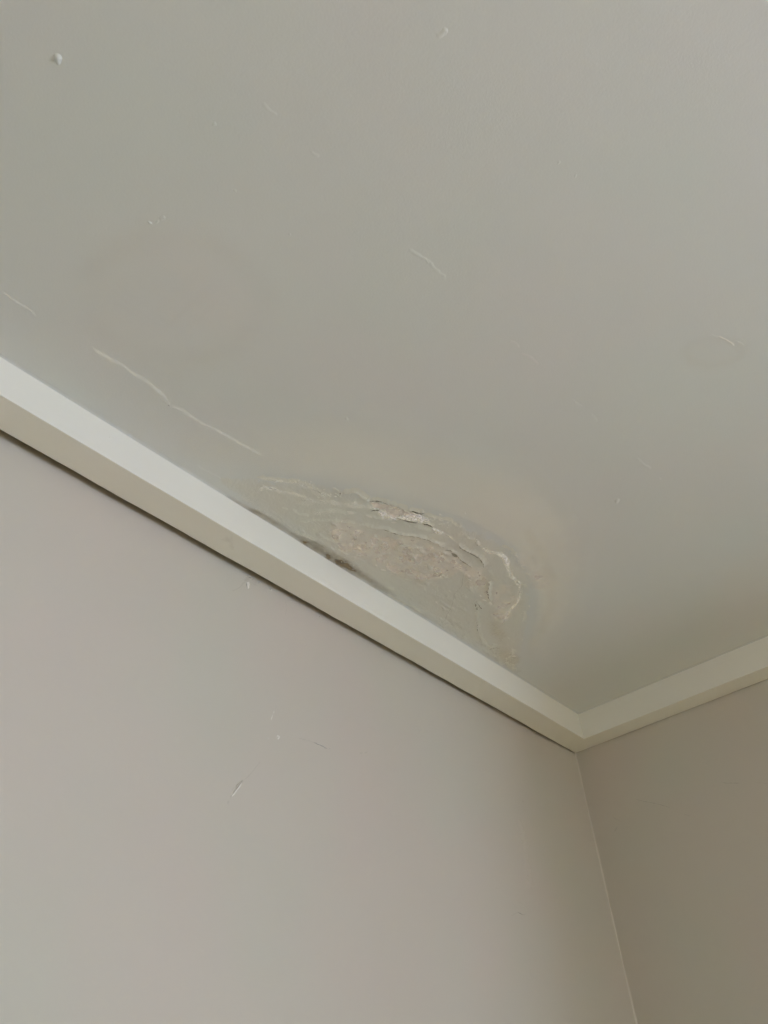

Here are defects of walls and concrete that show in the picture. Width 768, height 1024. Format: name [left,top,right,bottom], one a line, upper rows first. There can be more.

peeling [218,475,532,672]